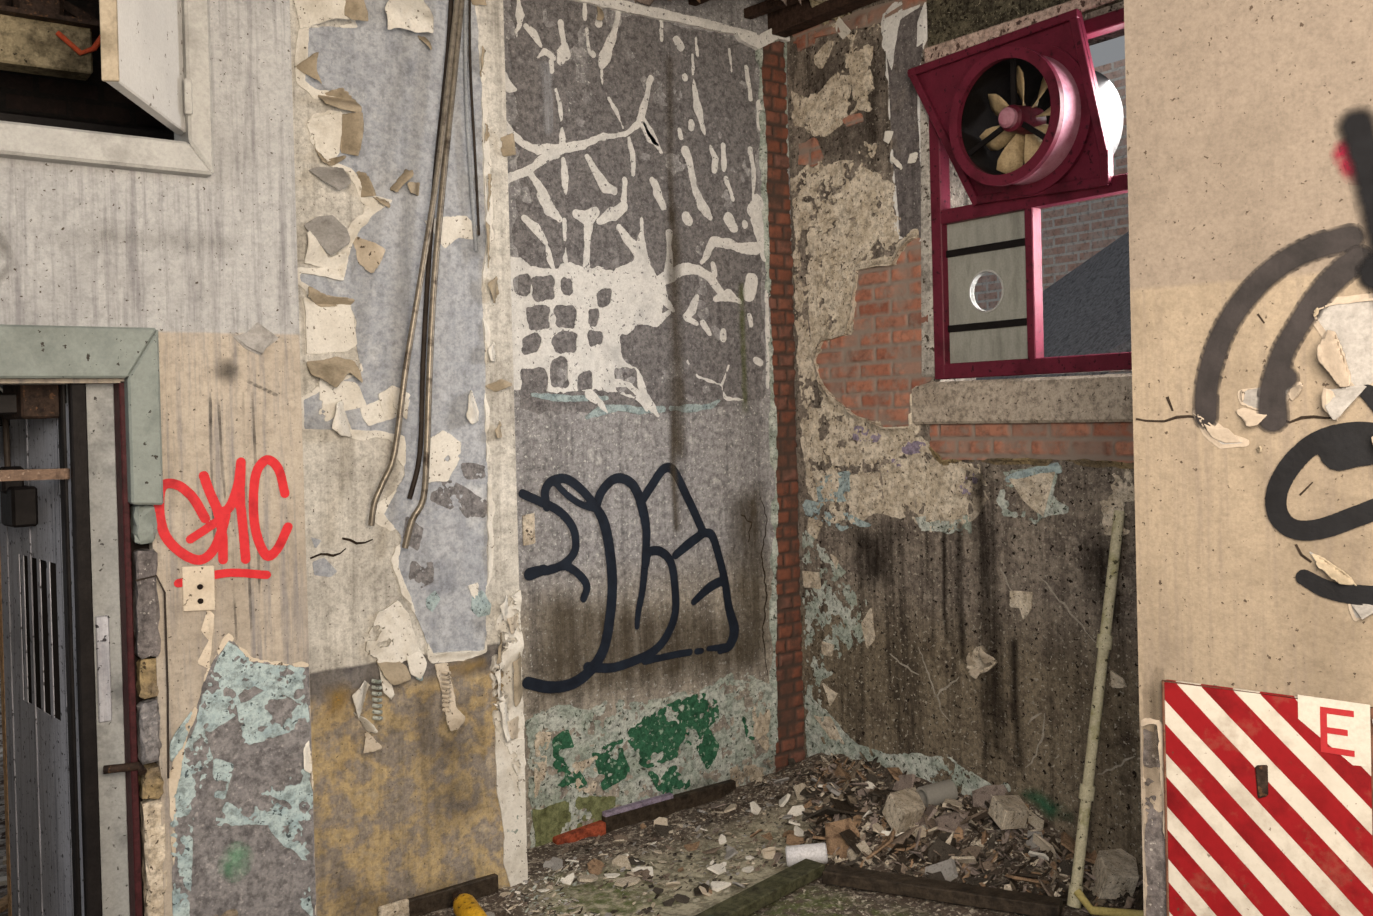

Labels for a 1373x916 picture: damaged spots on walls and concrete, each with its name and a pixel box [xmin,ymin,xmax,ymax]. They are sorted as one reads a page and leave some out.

peeling [234,322,278,355]
peeling [294,0,1135,887]
damp [943,525,964,658]
damp [976,474,988,628]
damp [1087,549,1109,587]
peeling [130,504,316,916]
damp [986,641,1019,754]
peeling [1141,718,1167,916]